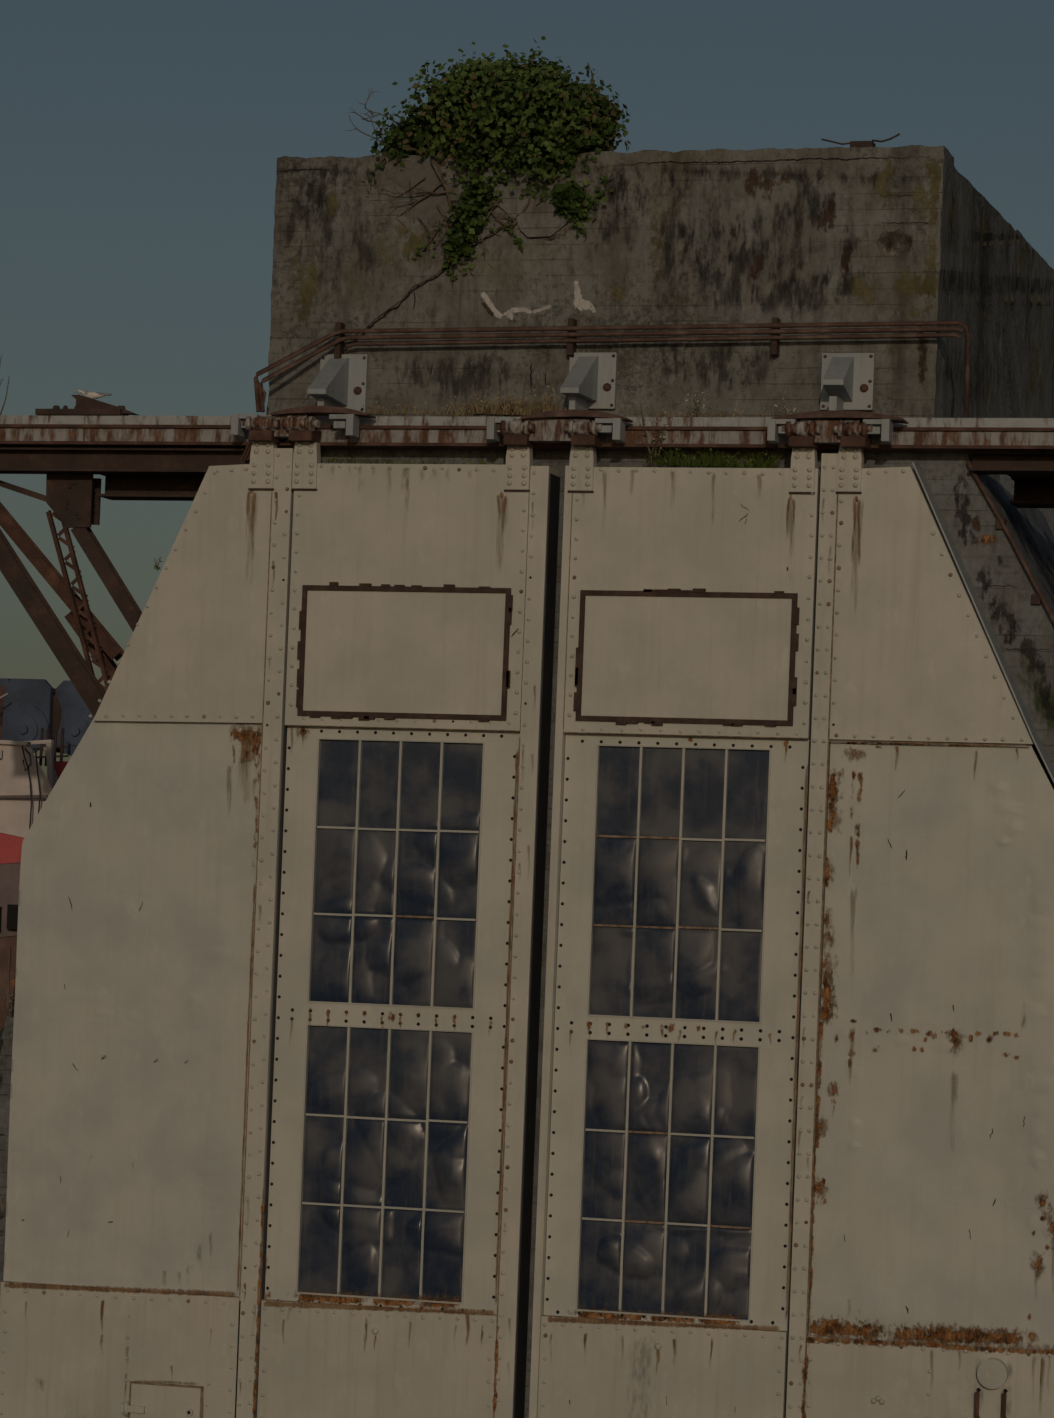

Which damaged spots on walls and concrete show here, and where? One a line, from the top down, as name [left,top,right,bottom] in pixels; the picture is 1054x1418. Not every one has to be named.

crack [344,196,572,352]
water stain [704,170,827,308]
mould [954,476,975,546]
mould [977,570,1054,719]
corrosion [231,726,262,848]
corrosion [827,741,999,865]
corrosion [5,753,518,1418]
corrosion [548,766,810,1363]
corrosion [810,914,1018,1302]
corrosion [1031,1195,1054,1275]
corrosion [799,1314,1054,1418]